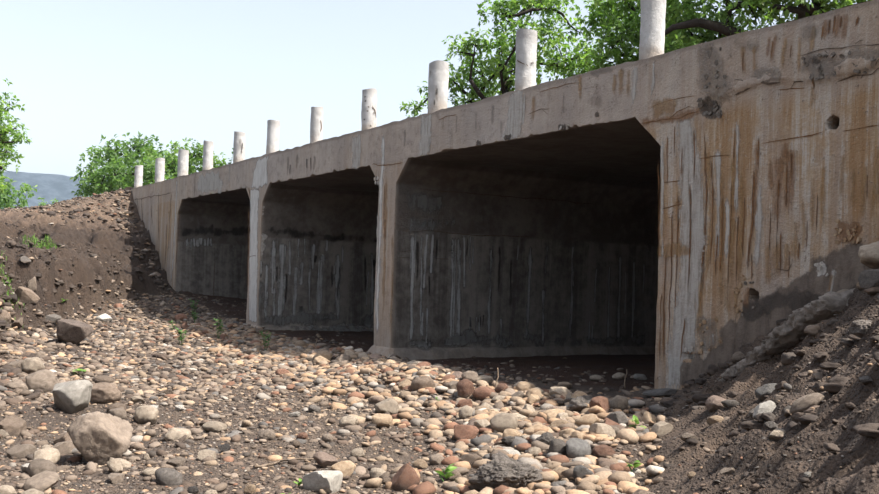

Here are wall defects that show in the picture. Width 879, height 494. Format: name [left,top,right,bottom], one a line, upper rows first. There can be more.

rust [643,99,699,173]
spalling [697,47,726,119]
rust [767,16,859,66]
spalling [801,51,867,80]
leakage [174,135,385,332]
leakage [408,193,455,350]
leakage [445,236,645,348]
rust [657,135,759,361]
leakage [668,119,873,386]
rust [766,144,824,279]